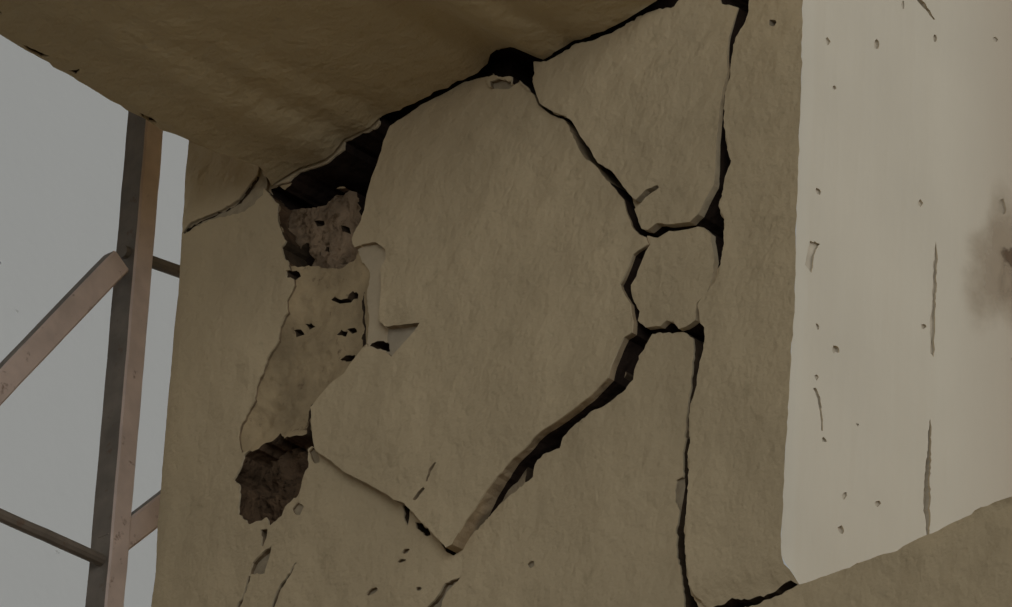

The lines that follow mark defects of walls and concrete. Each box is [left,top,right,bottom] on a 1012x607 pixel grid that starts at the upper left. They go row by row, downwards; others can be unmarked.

crack [730,0,749,11]
crack [917,0,935,20]
crack [378,0,678,129]
crack [183,166,278,234]
spalling [233,124,417,525]
crack [930,245,938,357]
crack [237,529,296,607]
crack [292,502,304,515]
crack [403,505,456,555]
crack [498,467,534,506]
crack [675,334,797,607]
crack [923,421,932,535]